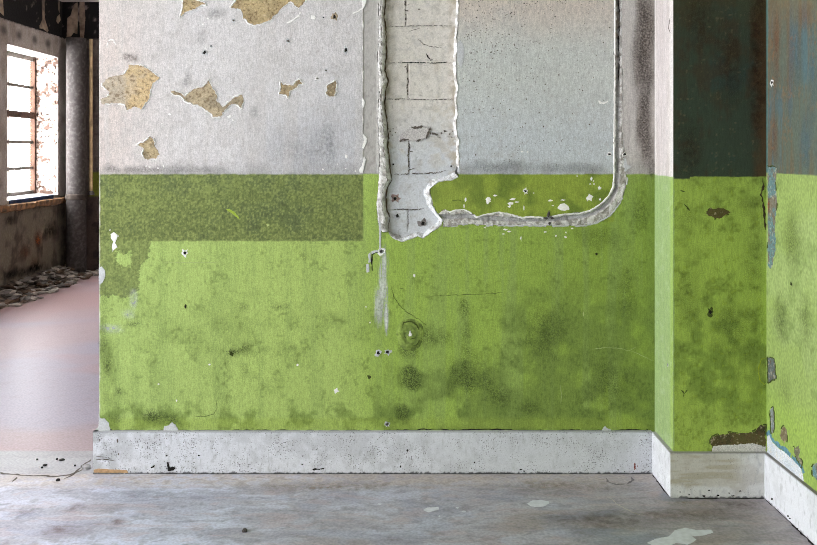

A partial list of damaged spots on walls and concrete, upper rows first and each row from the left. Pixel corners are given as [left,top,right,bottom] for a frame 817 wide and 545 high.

peeling [230,0,307,26]
peeling [100,63,160,111]
peeling [171,69,244,121]
peeling [278,78,304,99]
peeling [135,136,164,169]
spalling [366,0,631,273]
water stain [637,96,651,157]
peeling [706,208,730,220]
crack [759,178,767,230]
peeling [767,165,778,269]
water stain [375,253,388,331]
peeling [709,406,817,481]